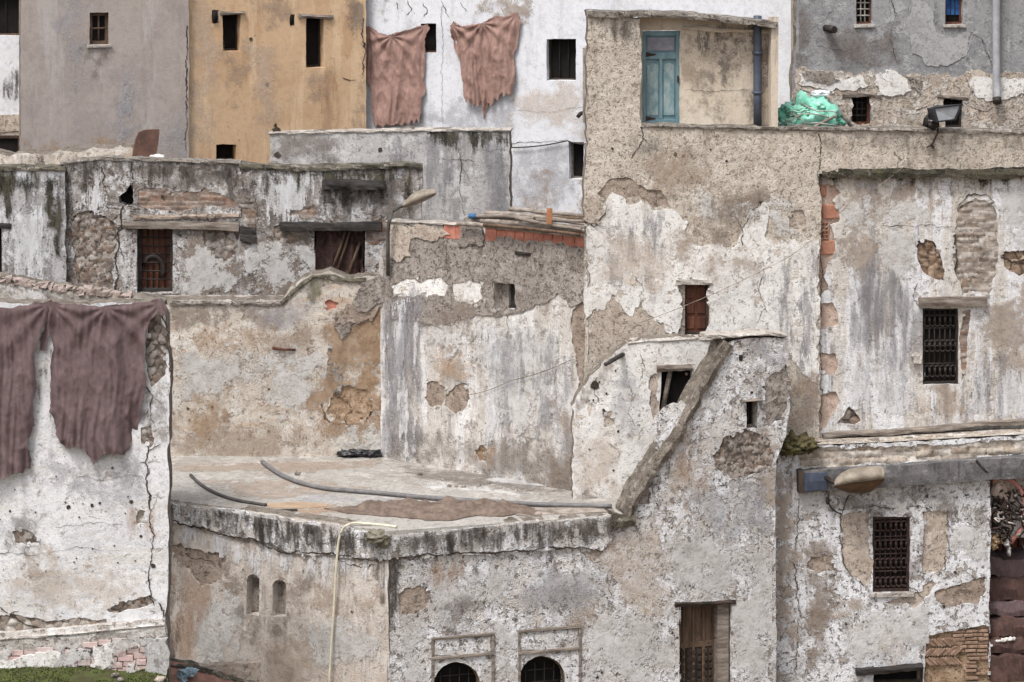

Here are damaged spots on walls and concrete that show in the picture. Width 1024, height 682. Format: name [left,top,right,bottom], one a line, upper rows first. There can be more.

flaking render [792,66,1024,129]
water stain [0,177,12,218]
water stain [44,181,62,256]
flaking render [0,210,133,299]
crack [1,164,134,299]
flaking render [424,381,470,415]
peeling [564,175,1024,682]
crack [80,316,613,618]
flaking render [171,543,228,586]
water stain [171,509,519,624]
water stain [582,517,613,545]
flaking render [0,595,156,631]